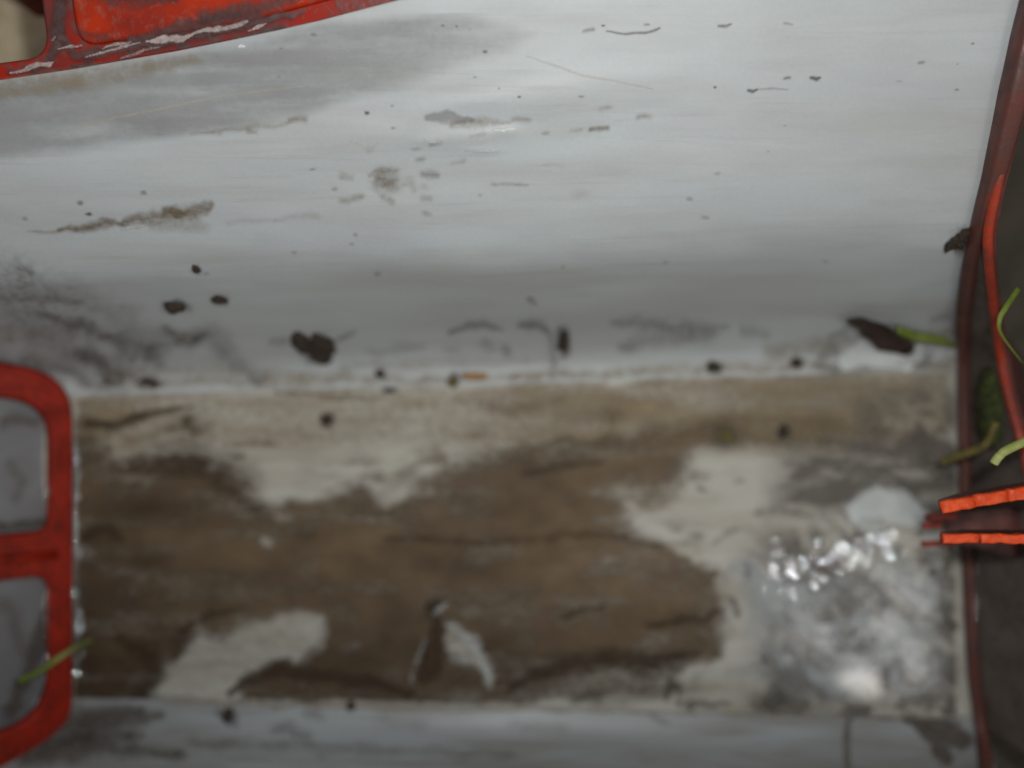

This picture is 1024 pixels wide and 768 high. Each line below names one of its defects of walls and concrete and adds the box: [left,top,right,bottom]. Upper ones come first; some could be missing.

damp [845,487,942,567]
damp [746,562,938,700]